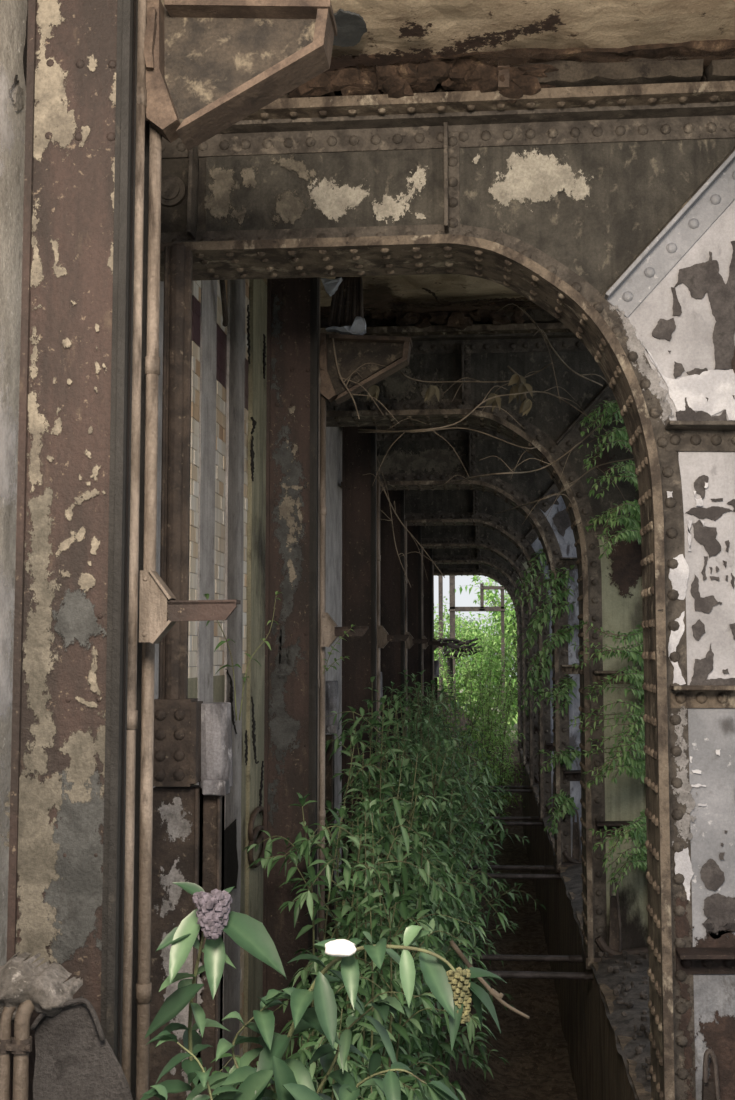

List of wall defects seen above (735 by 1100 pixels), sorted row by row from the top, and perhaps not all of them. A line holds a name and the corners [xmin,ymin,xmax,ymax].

peeling [12,0,90,161]
peeling [269,153,428,227]
peeling [488,148,594,212]
peeling [30,198,67,310]
peeling [652,241,735,379]
peeling [676,397,728,421]
peeling [21,326,106,804]
peeling [668,475,735,685]
peeling [158,797,194,842]
peeling [674,830,735,939]
peeling [154,857,205,1097]
corrosion [696,1010,735,1100]